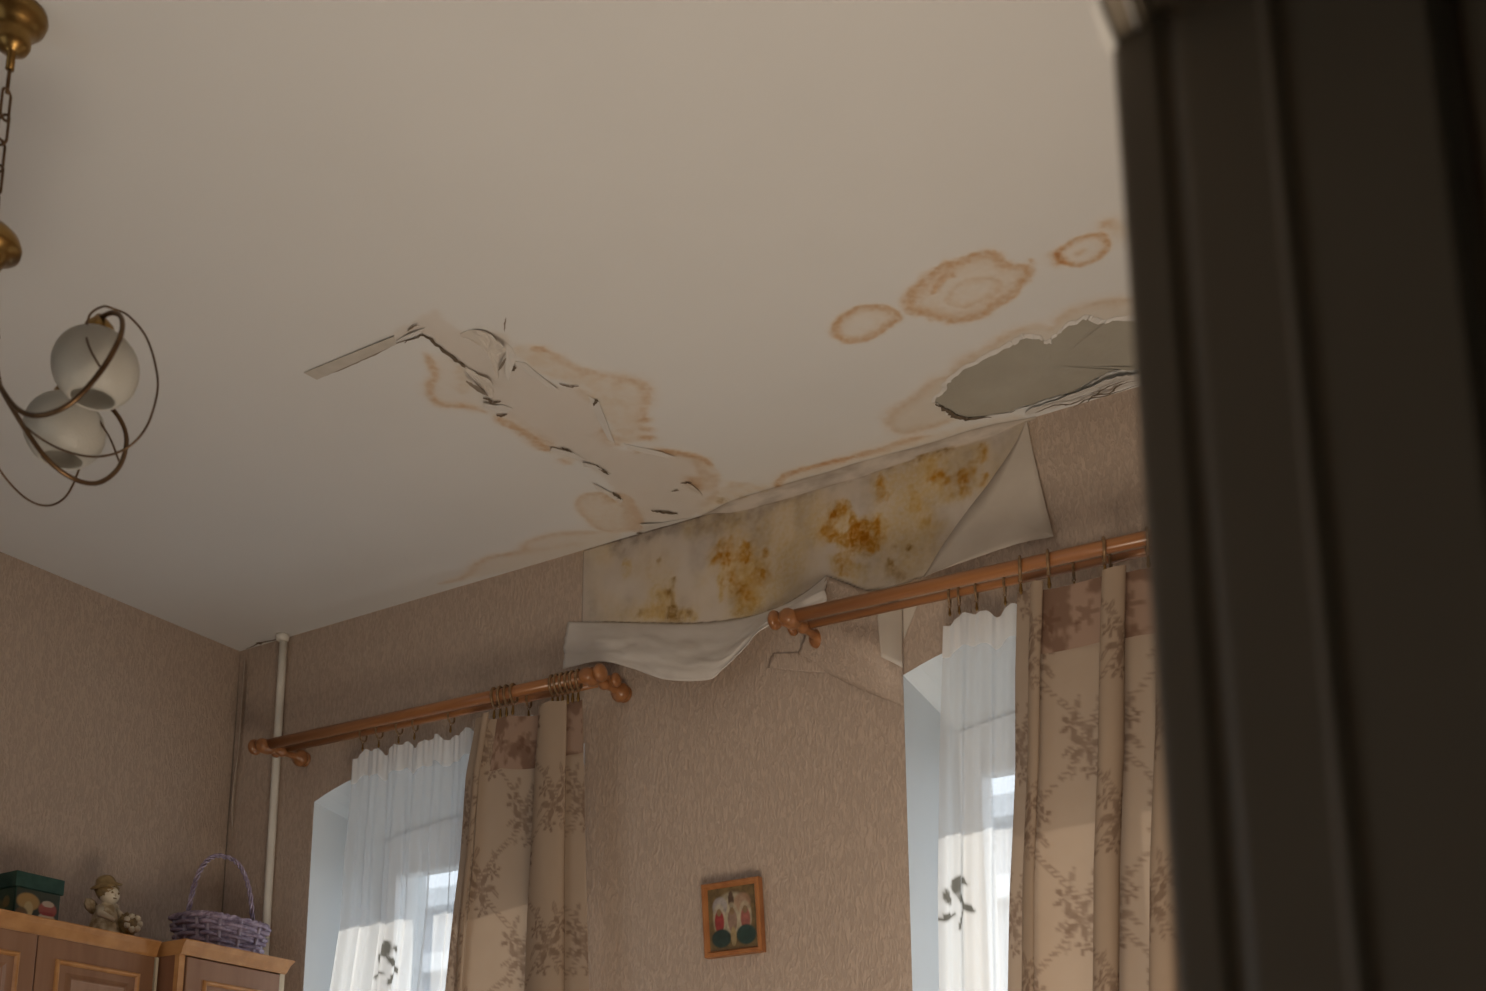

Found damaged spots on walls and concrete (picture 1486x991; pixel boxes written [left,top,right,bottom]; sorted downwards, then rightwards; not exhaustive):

peeling [304,319,674,458]
peeling [582,315,1136,624]